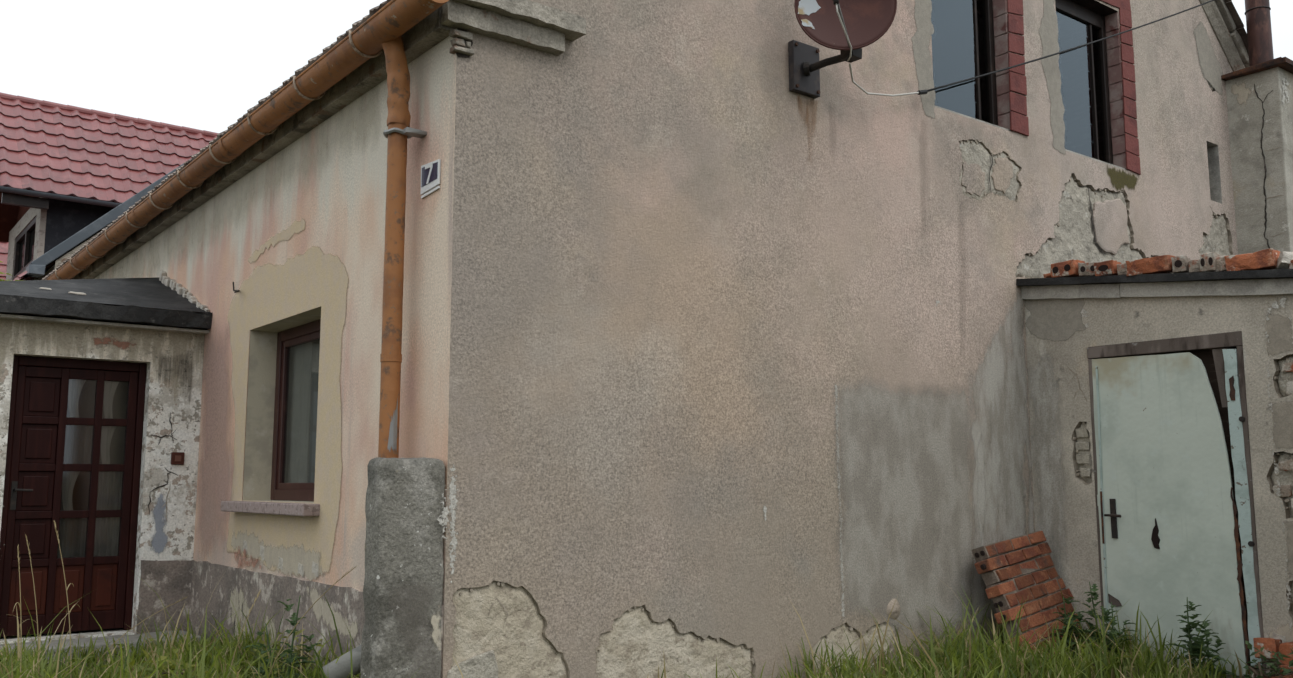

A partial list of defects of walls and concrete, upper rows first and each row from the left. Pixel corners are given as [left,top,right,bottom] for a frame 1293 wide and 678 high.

spalling [959,139,1022,202]
crack [1254,83,1293,270]
spalling [1015,173,1158,278]
spalling [1198,208,1233,256]
spalling [94,338,136,349]
spalling [1273,354,1293,398]
spalling [1071,421,1093,485]
spalling [1267,451,1293,519]
spalling [431,464,570,678]
spalling [595,605,756,678]
spalling [812,621,899,678]
spalling [1269,580,1293,643]